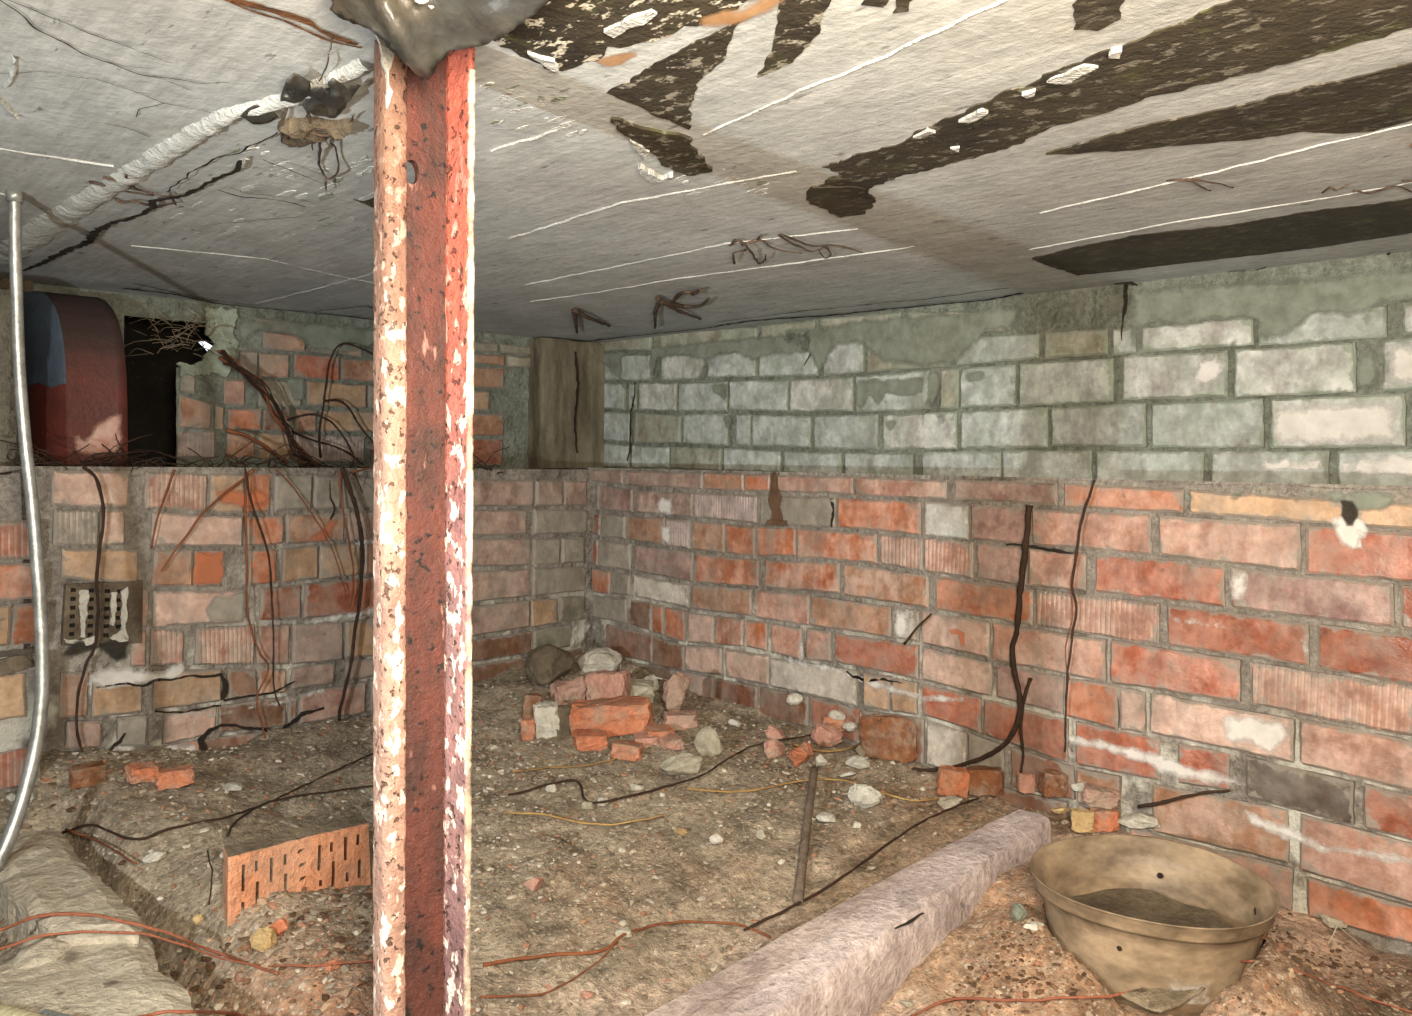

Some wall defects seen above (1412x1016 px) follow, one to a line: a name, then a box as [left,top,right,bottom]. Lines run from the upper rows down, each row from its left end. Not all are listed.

peeling [757,0,831,78]
peeling [806,0,1412,218]
peeling [466,0,769,419]
peeling [1032,198,1412,276]
hole [1341,501,1357,526]
spalling [465,438,473,771]
efflorescence [1224,717,1286,751]
spalling [464,791,472,891]